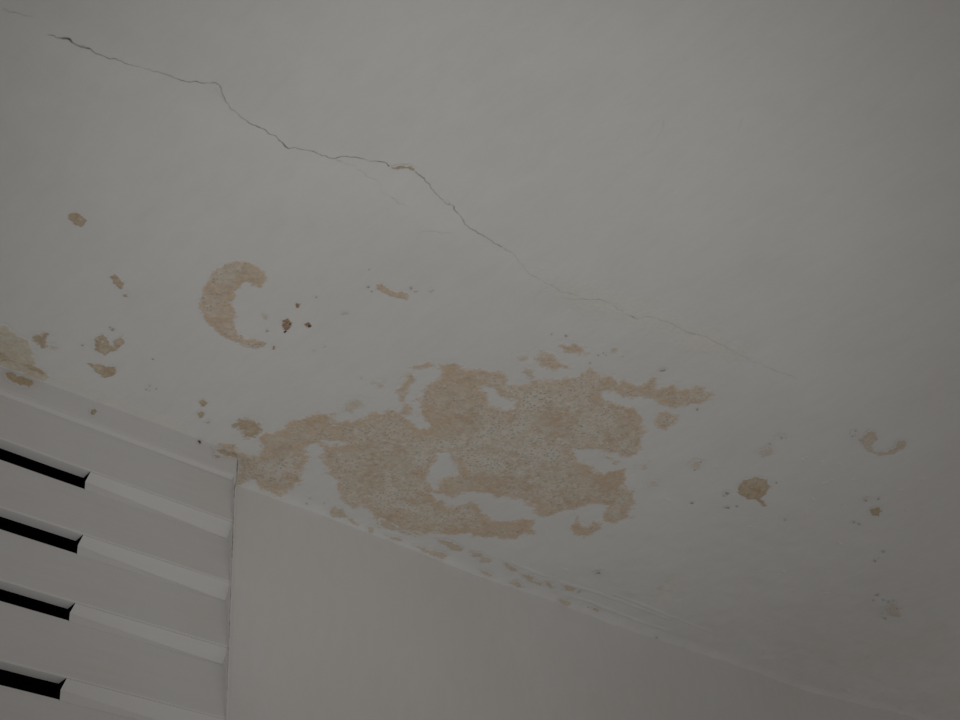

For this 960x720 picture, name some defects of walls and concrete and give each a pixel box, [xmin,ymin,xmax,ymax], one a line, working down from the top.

peeling [66,211,89,229]
crack [2,8,798,379]
peeling [194,257,272,350]
peeling [80,326,127,380]
peeling [211,332,720,607]
peeling [722,476,778,509]